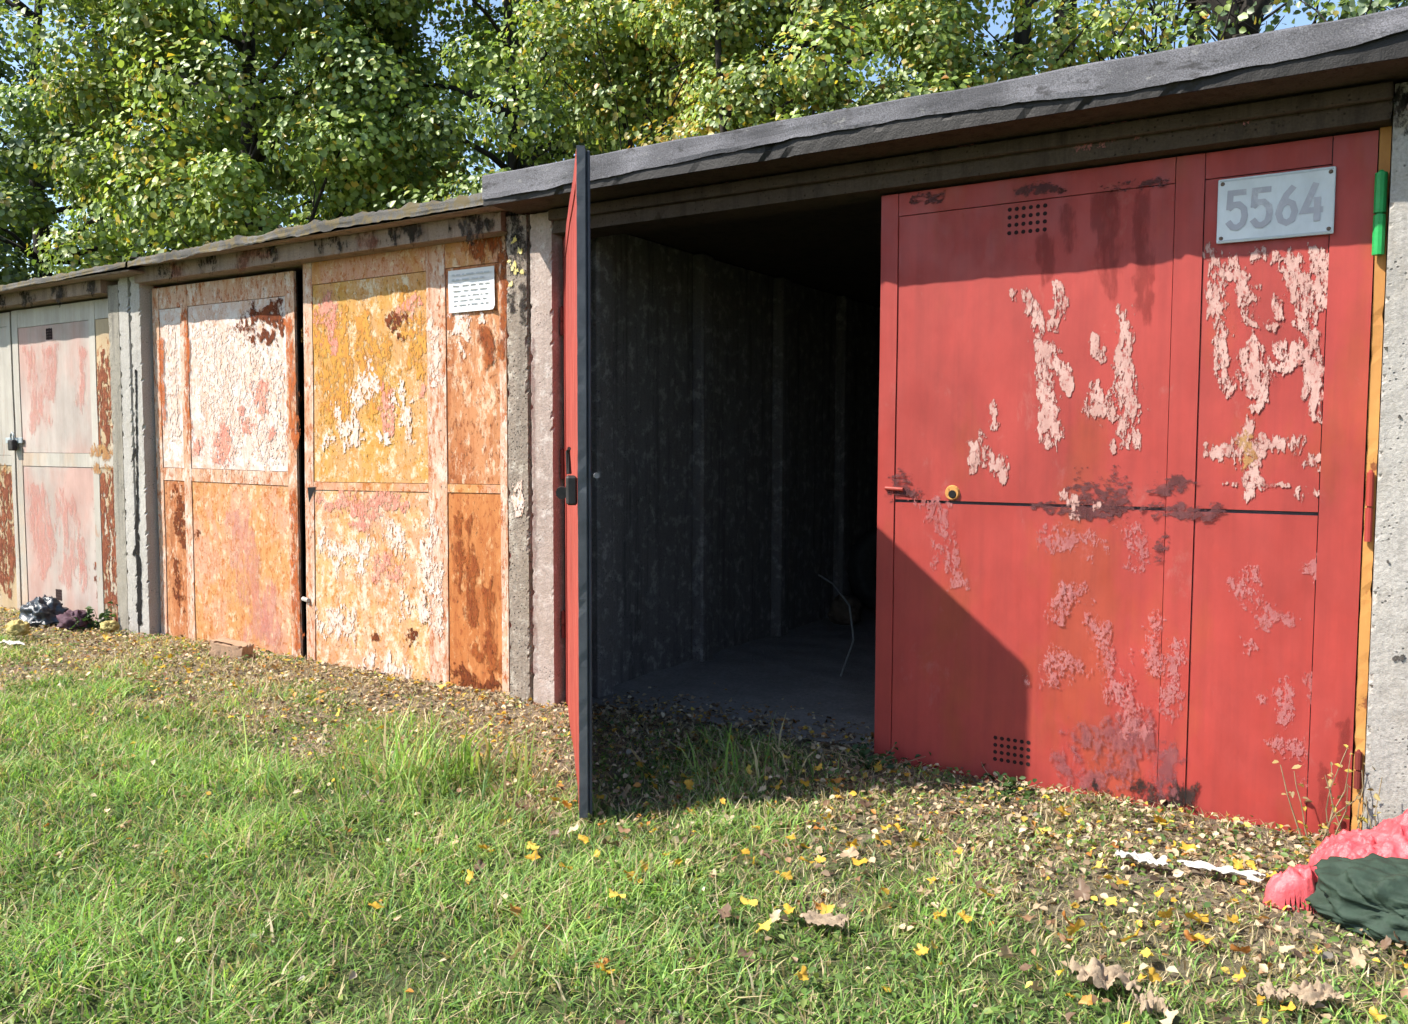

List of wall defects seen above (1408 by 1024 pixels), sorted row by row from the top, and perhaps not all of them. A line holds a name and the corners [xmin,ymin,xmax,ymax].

corrosion [0,464,16,598]
corrosion [90,341,118,621]
peeling [163,304,288,471]
corrosion [289,487,305,651]
corrosion [233,285,427,450]
peeling [315,481,444,637]
peeling [319,293,485,458]
corrosion [449,510,502,692]
peeling [965,399,1010,486]
peeling [1009,279,1149,459]
corrosion [1031,465,1225,562]
peeling [1198,241,1329,504]